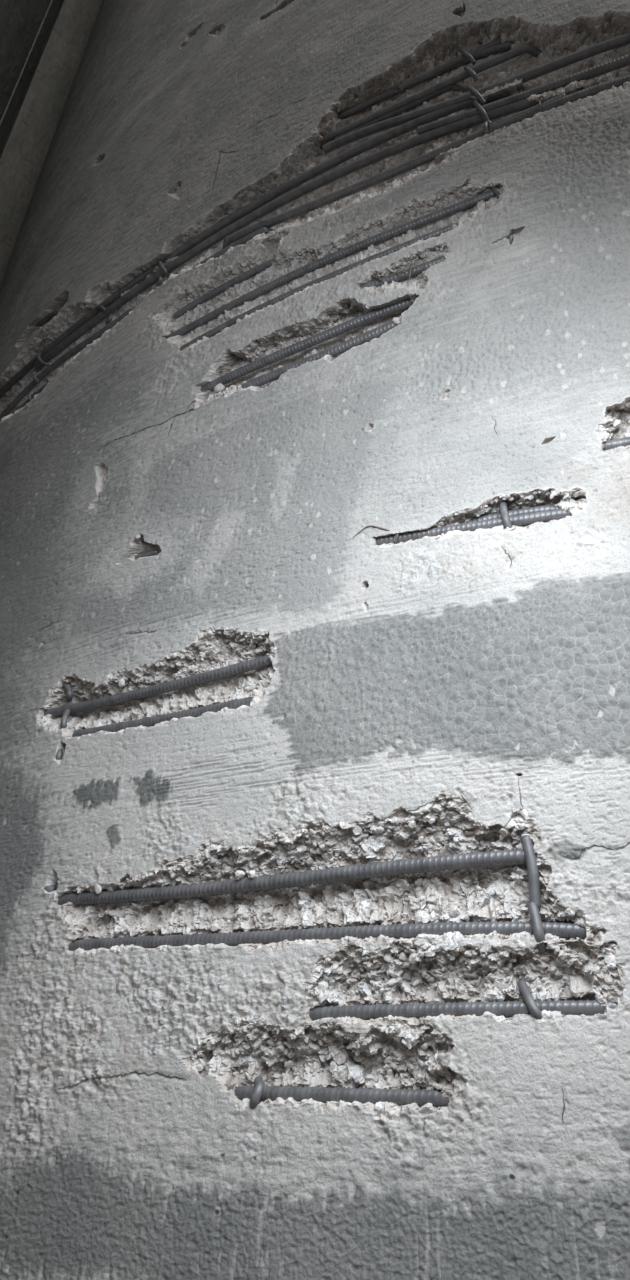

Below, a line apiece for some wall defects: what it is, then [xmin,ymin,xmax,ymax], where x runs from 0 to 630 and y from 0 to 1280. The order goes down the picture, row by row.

spalling [0,0,630,424]
peeling [93,521,177,595]
peeling [344,385,630,618]
peeling [0,626,630,1206]
crack [58,1071,187,1091]